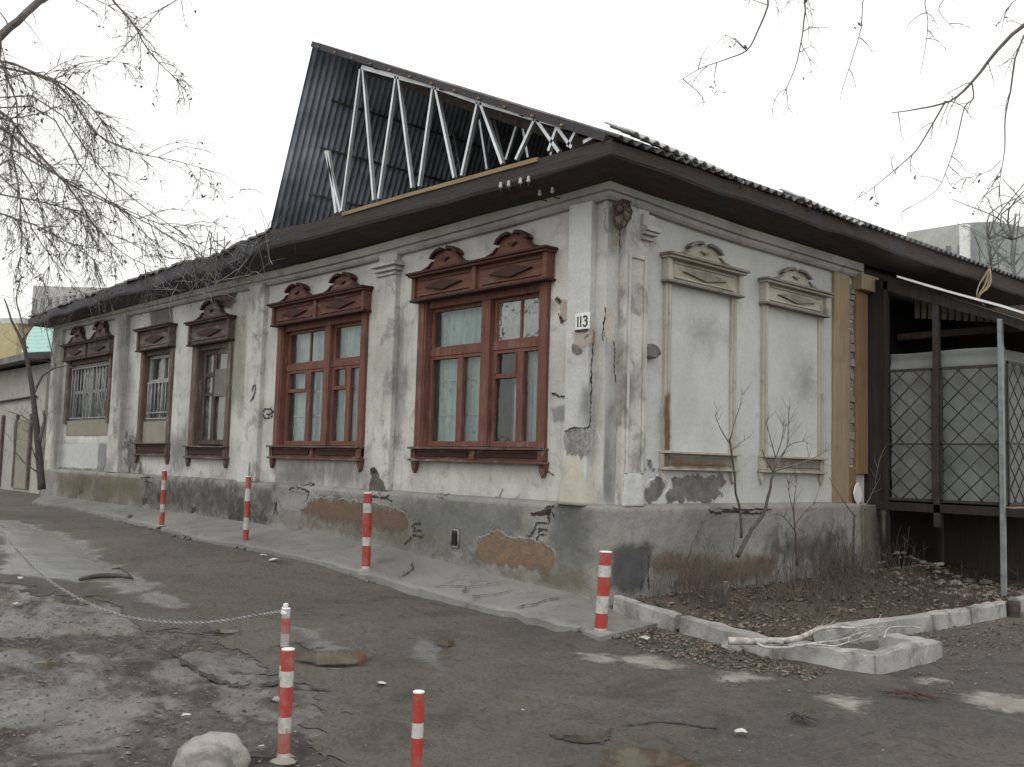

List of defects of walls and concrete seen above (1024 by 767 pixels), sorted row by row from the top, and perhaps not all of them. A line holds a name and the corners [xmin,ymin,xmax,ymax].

peeling [571,331,591,354]
crack [564,307,616,432]
peeling [563,428,601,460]
corrosion [664,395,725,469]
spalling [279,467,410,535]
crack [528,504,555,541]
peeling [645,457,727,504]
spalling [476,529,556,576]
leakage [610,544,651,592]